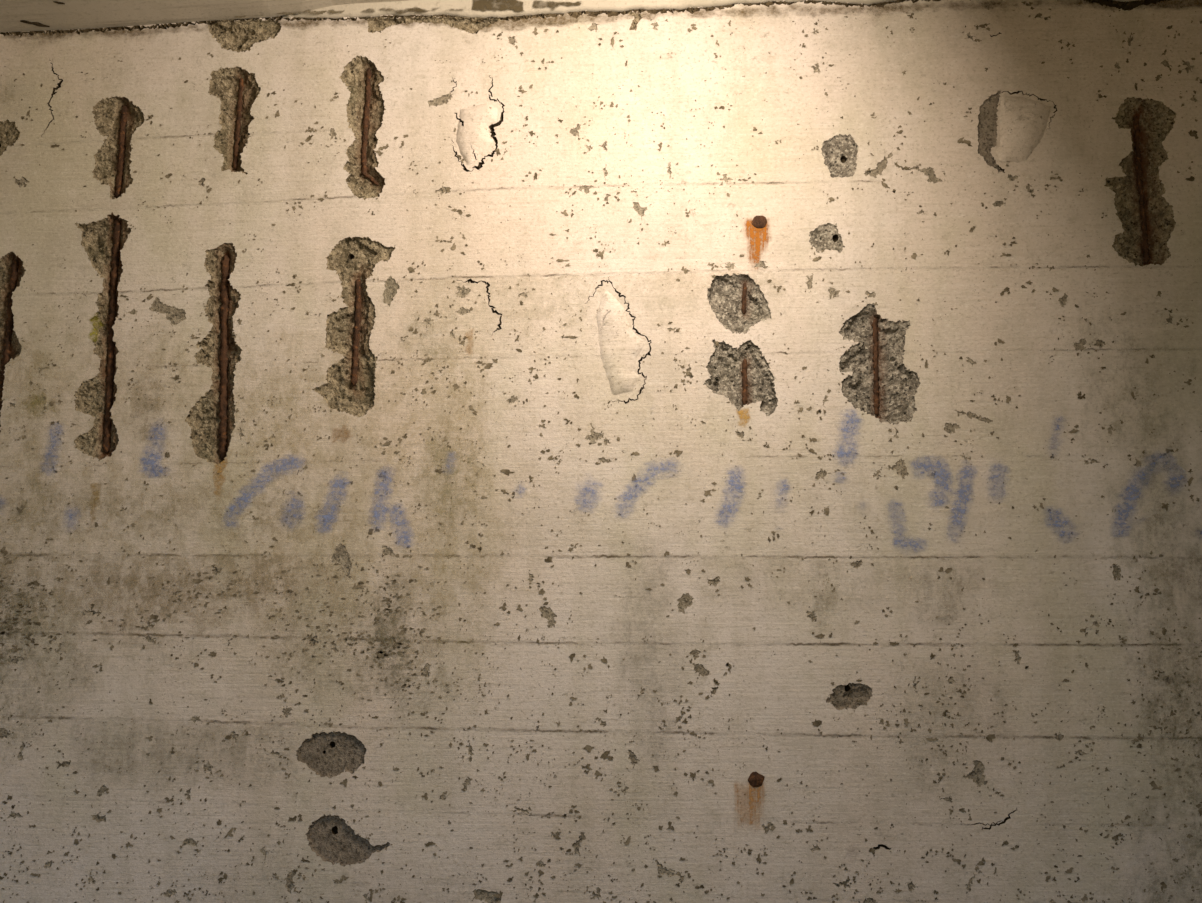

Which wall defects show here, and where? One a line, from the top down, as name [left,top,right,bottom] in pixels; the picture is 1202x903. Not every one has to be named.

peeling [962,8,993,42]
spalling [184,17,284,186]
crack [450,77,505,172]
peeling [957,91,1063,216]
spalling [1080,0,1202,269]
crack [585,280,652,404]
rust [745,216,769,268]
spalling [657,97,1021,502]
spalling [0,51,939,903]
rust [735,772,765,824]